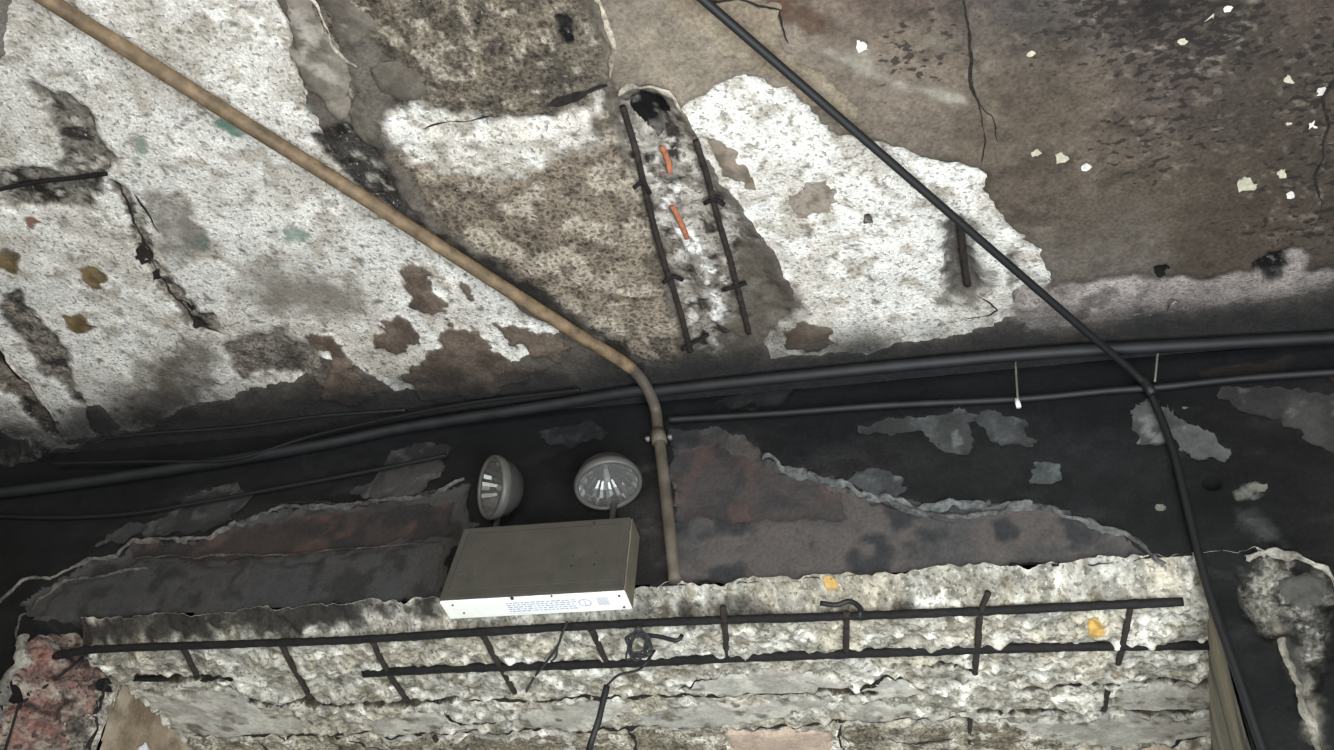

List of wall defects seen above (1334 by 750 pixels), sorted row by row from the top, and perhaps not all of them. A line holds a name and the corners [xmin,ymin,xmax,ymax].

flaking render [0,0,1334,462]
crack [963,0,998,164]
crack [1307,72,1334,237]
flaking render [667,407,1166,585]
flaking render [0,442,480,750]
spalling [186,727,729,750]
crack [85,660,1208,750]
spalling [839,720,1078,750]
leakage [1274,624,1321,739]